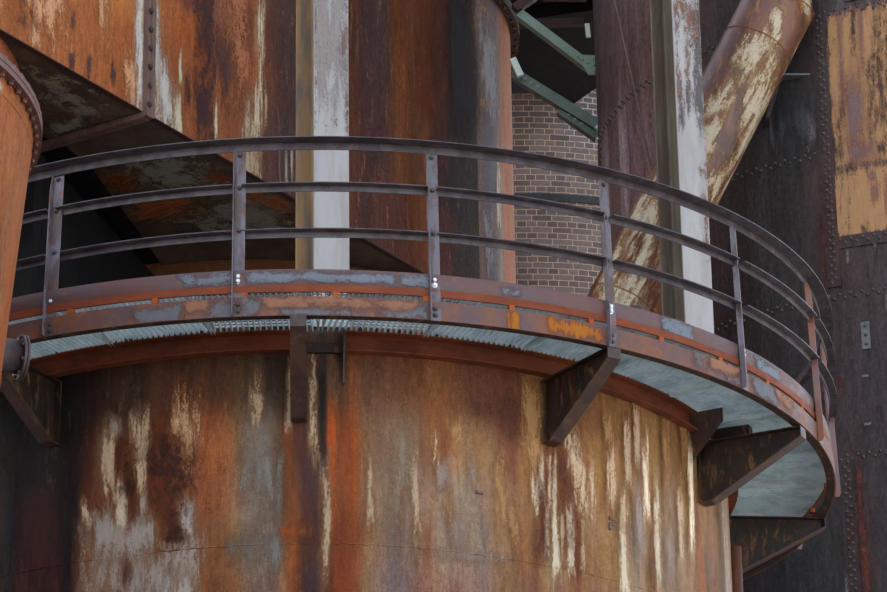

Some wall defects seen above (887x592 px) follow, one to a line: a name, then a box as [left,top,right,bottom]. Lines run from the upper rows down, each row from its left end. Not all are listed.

corrosion [17,0,77,55]
corrosion [185,0,256,141]
corrosion [315,0,349,133]
peeling [677,0,812,205]
corrosion [125,197,203,222]
peeling [593,193,660,306]
corrosion [620,230,661,312]
peeling [80,409,206,592]
corrosion [118,426,196,544]
peeling [170,391,203,478]
corrosion [281,396,359,592]
corrosion [536,432,584,577]